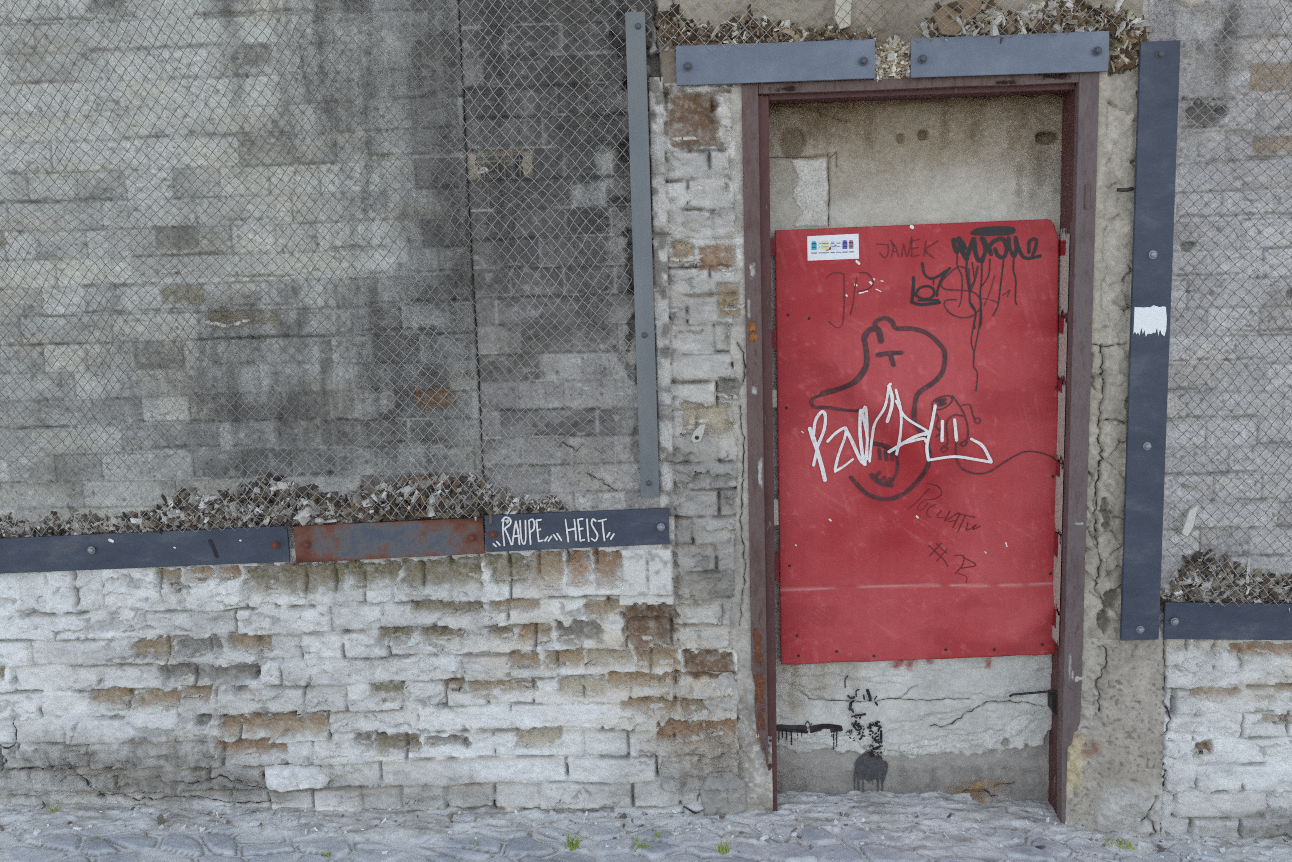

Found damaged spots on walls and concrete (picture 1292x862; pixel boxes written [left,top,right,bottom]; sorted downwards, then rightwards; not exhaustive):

spalling [651,91,755,317]
peeling [660,461,672,491]
crack [1093,344,1124,599]
spalling [94,634,271,711]
spalling [161,548,737,748]
crack [803,693,1043,728]
spalling [1191,688,1236,703]
spalling [1230,641,1292,662]
spalling [219,711,329,758]
spalling [360,732,463,757]
crack [1141,639,1171,836]
spalling [1192,741,1211,759]